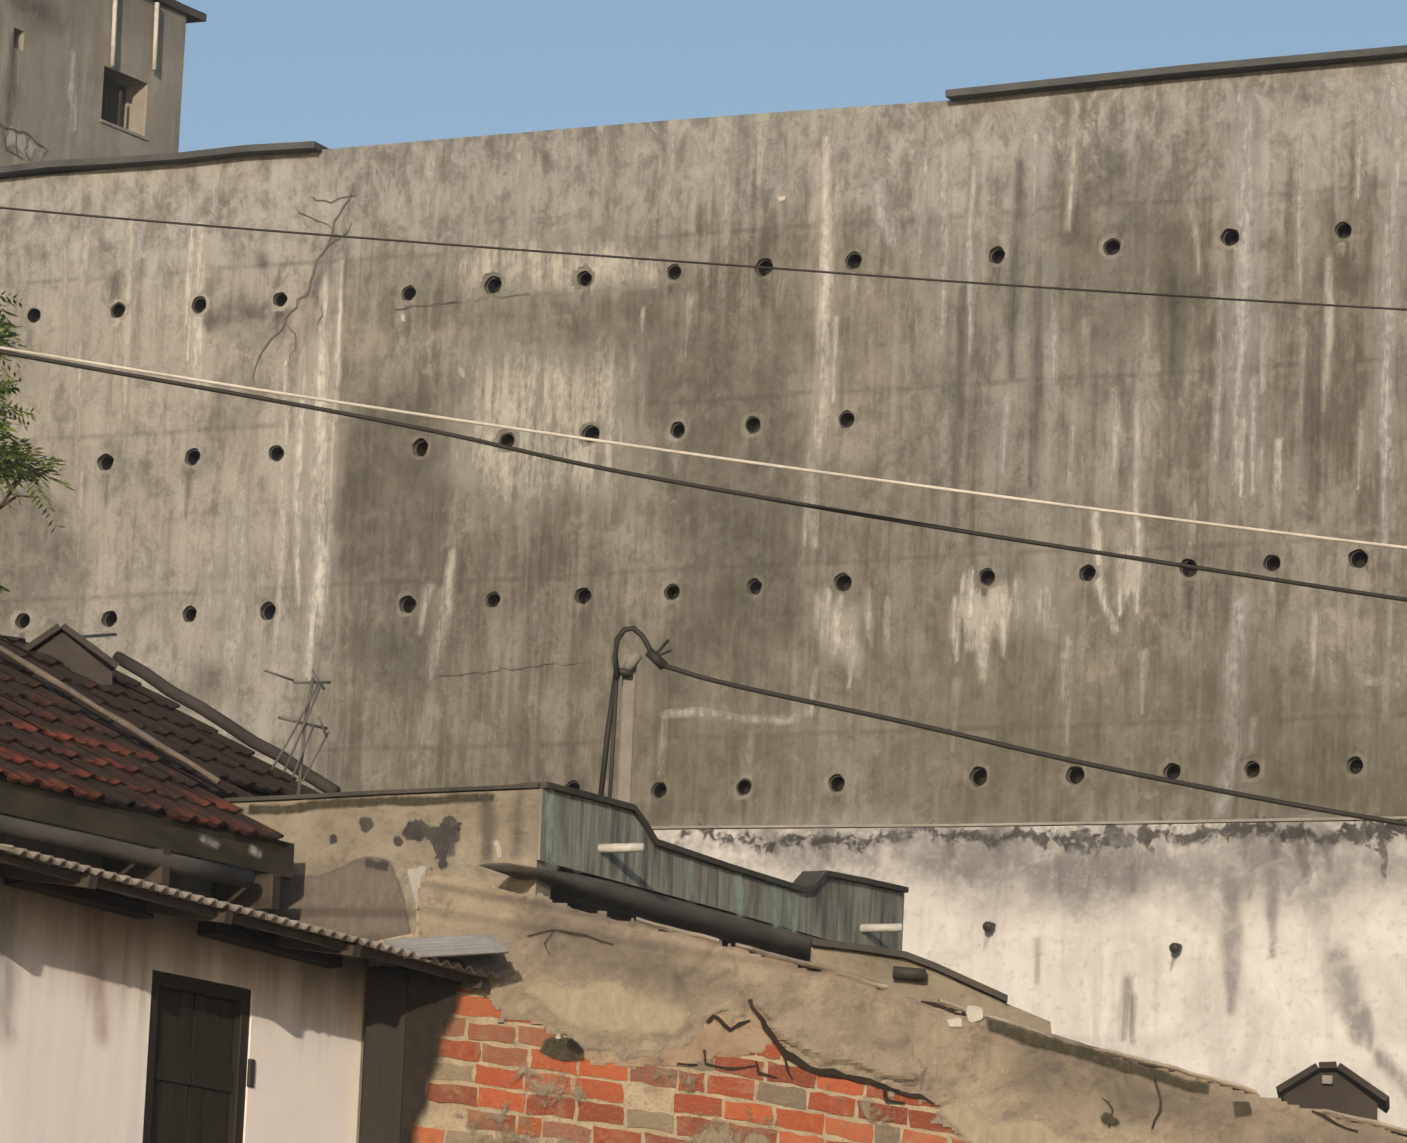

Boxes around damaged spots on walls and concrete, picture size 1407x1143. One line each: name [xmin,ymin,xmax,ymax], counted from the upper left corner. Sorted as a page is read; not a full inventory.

crack [252,183,356,385]
leakage [803,136,838,549]
leakage [1213,92,1281,497]
leakage [1299,257,1334,433]
leakage [1357,74,1406,544]
leakage [1110,388,1142,525]
leakage [1092,511,1118,631]
leakage [658,588,1407,1011]
peeling [520,979,690,1061]
spalling [946,1005,983,1027]
peeling [939,1100,1129,1143]
spalling [1233,1101,1251,1117]